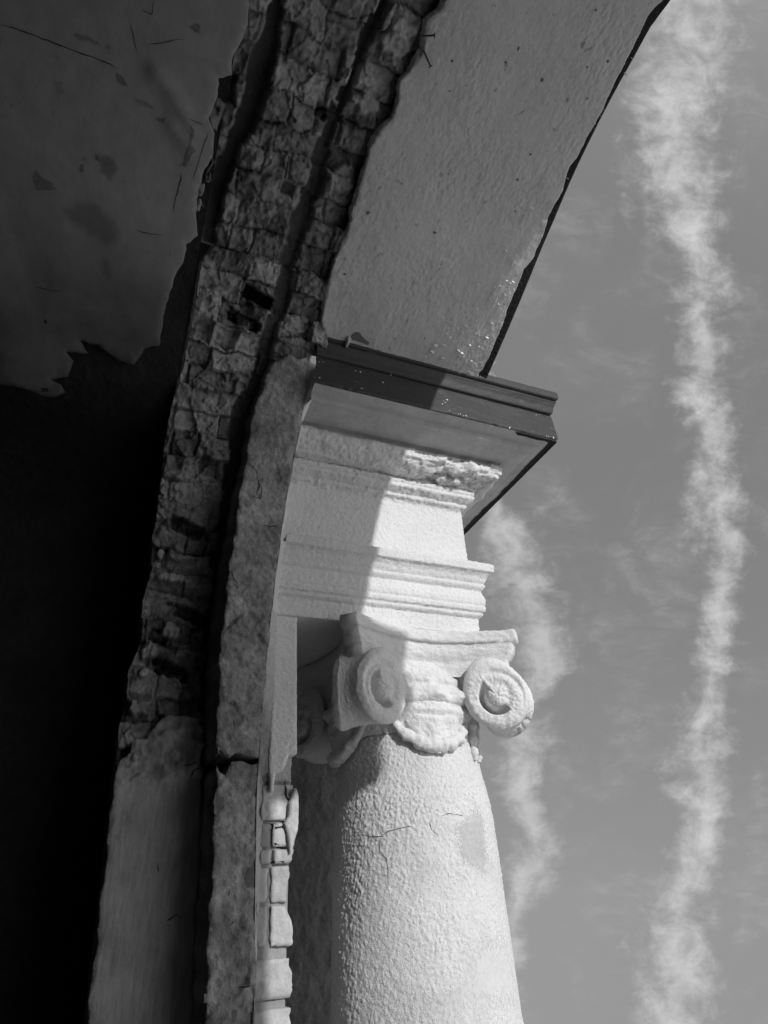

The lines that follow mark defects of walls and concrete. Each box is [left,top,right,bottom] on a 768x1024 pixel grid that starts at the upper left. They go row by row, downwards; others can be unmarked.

crack [5,25,119,71]
flaking render [83,0,448,1024]
crack [364,813,463,868]